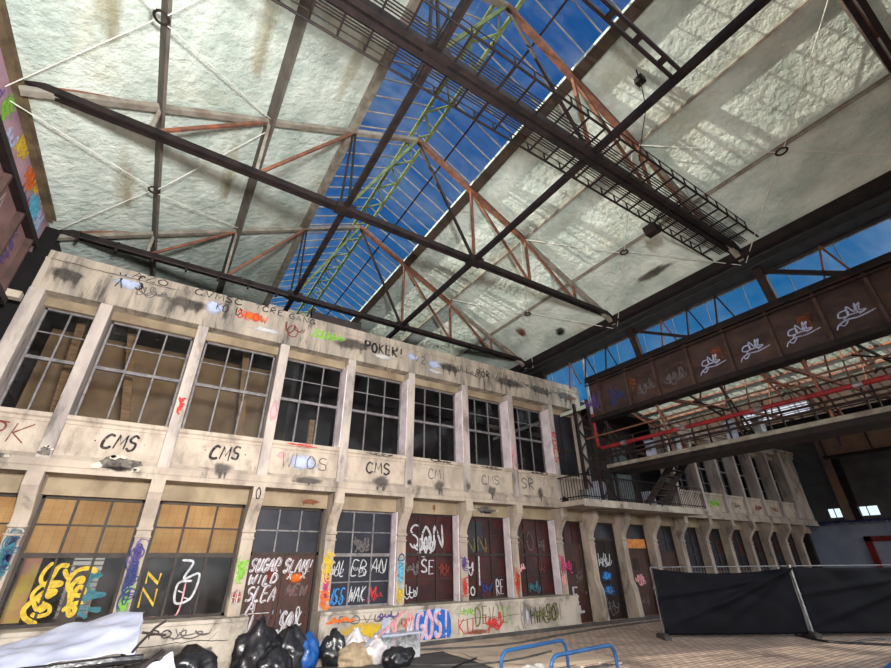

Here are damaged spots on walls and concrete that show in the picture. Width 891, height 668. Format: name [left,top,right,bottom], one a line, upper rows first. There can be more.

leakage [640,264,669,281]
spalling [90,455,143,473]